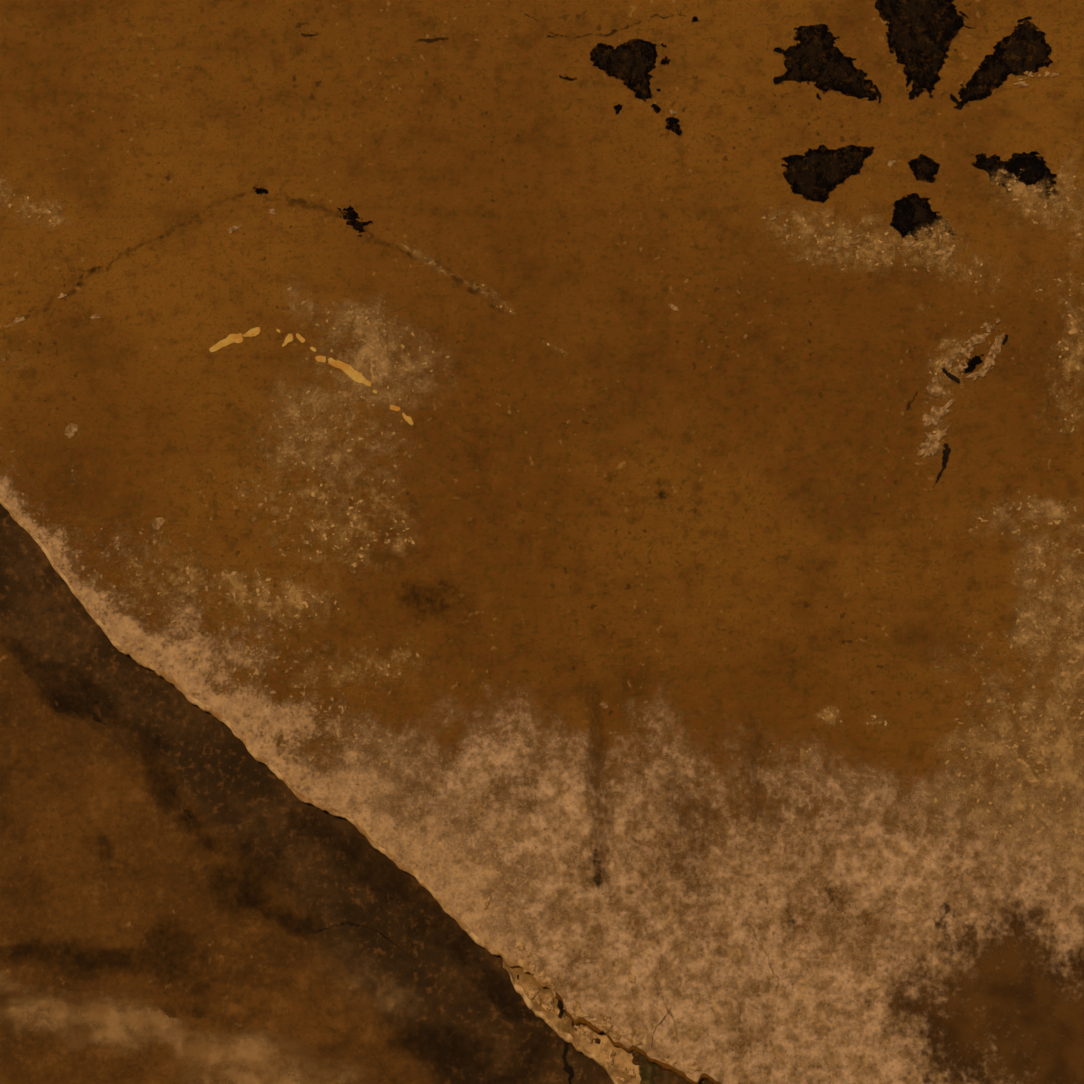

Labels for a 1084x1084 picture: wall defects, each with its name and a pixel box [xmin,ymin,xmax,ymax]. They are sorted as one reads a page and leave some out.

peeling [590,39,682,135]
peeling [1013,71,1059,87]
peeling [995,169,1065,210]
peeling [771,211,872,266]
spalling [65,423,78,439]
peeling [390,405,413,425]
spalling [907,318,1008,488]
efflorescence [130,557,340,629]
spalling [0,499,713,1084]
leakage [318,495,1084,1084]